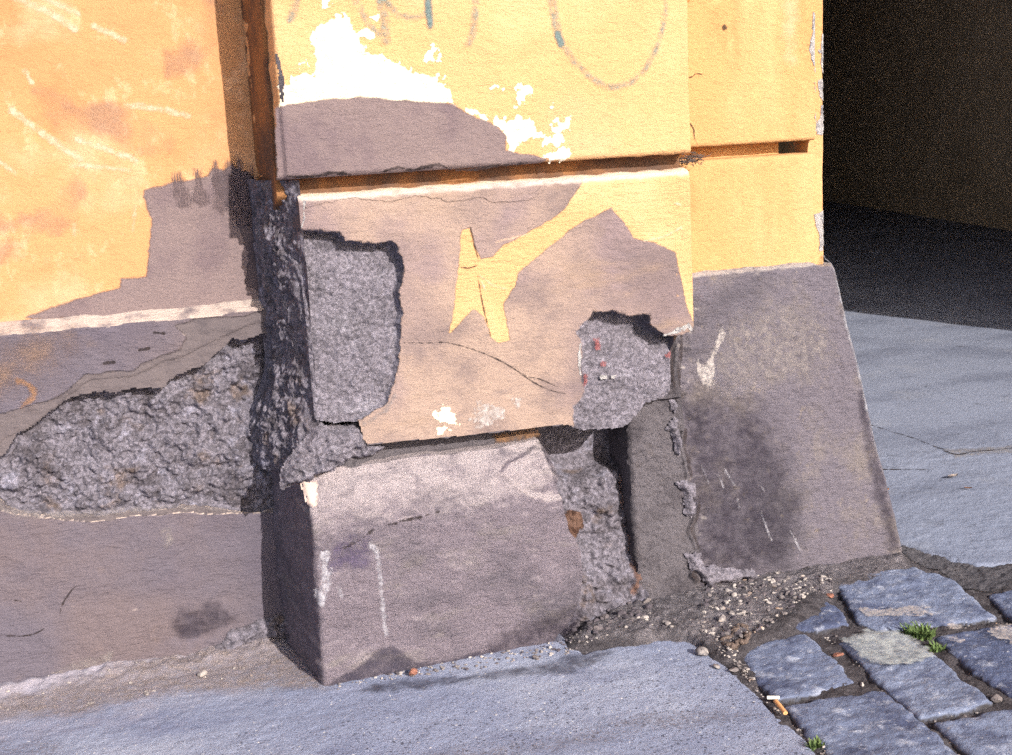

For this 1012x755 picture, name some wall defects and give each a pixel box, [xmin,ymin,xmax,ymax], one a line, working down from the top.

peeling [275,0,572,164]
spalling [383,163,526,172]
flaking render [0,171,545,522]
crack [428,227,565,394]
flaking render [572,310,692,430]